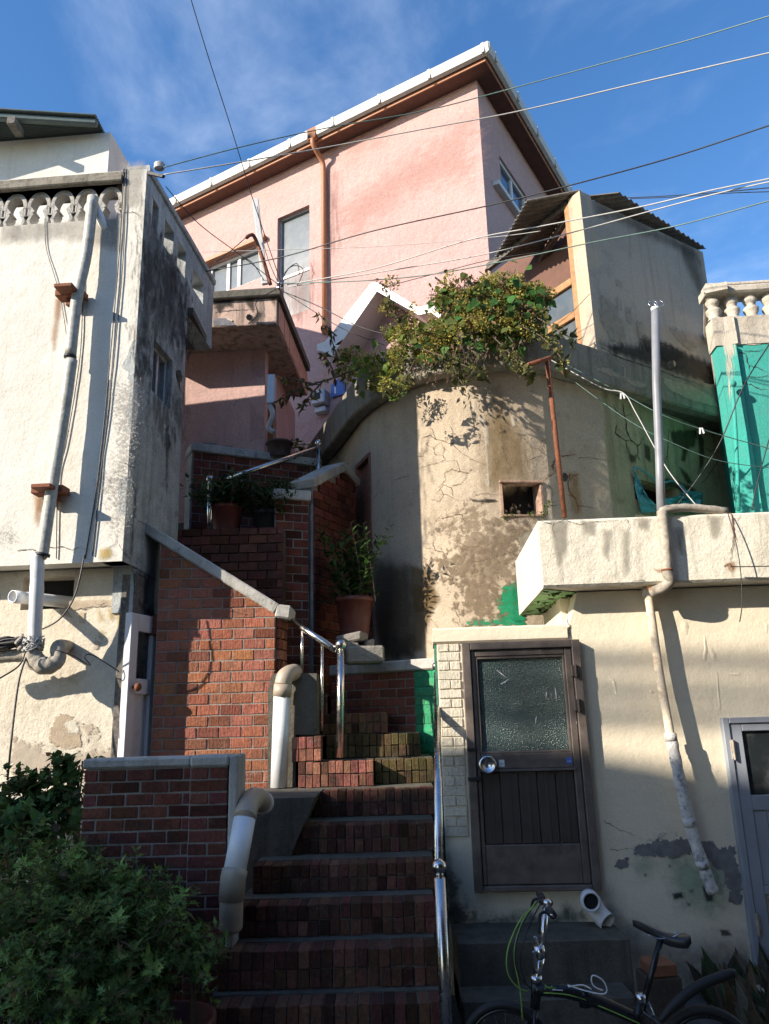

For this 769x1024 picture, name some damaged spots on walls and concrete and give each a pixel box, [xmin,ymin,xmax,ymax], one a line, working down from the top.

damp [592,281,718,408]
crack [397,405,669,628]
peeling [7,713,111,787]
peeling [610,833,743,905]